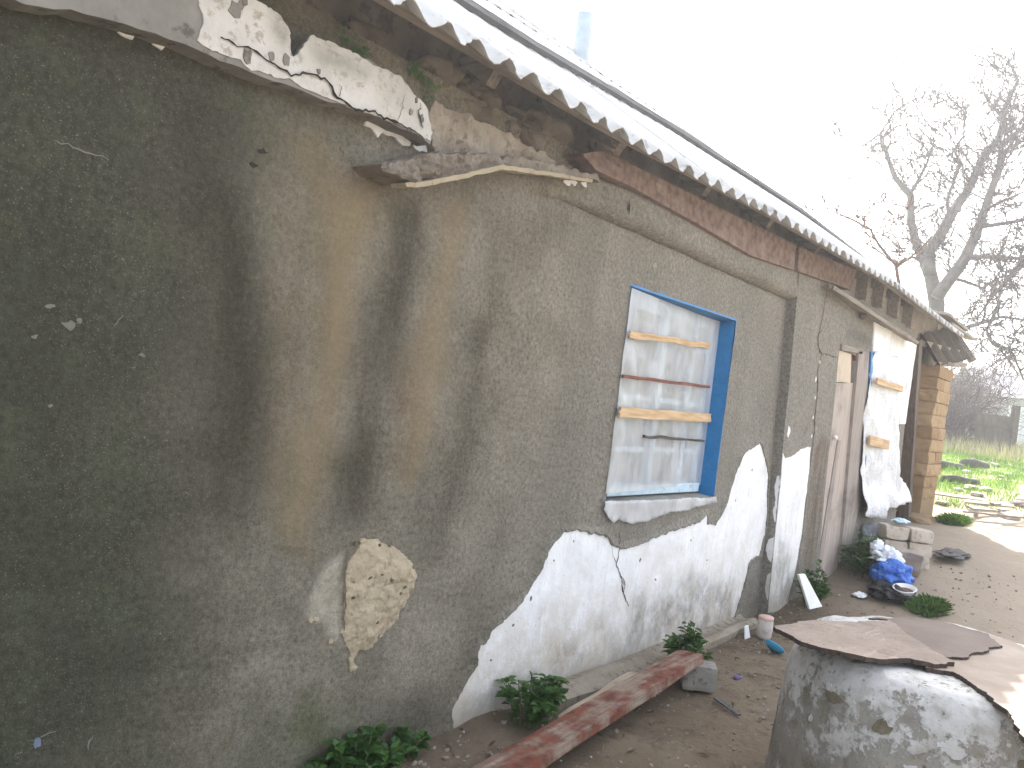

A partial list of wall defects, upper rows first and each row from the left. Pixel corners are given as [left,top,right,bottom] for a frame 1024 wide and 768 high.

crack [221,36,424,139]
peeling [197,0,557,165]
crack [795,292,834,585]
crack [612,535,629,606]
flaking render [446,437,811,746]